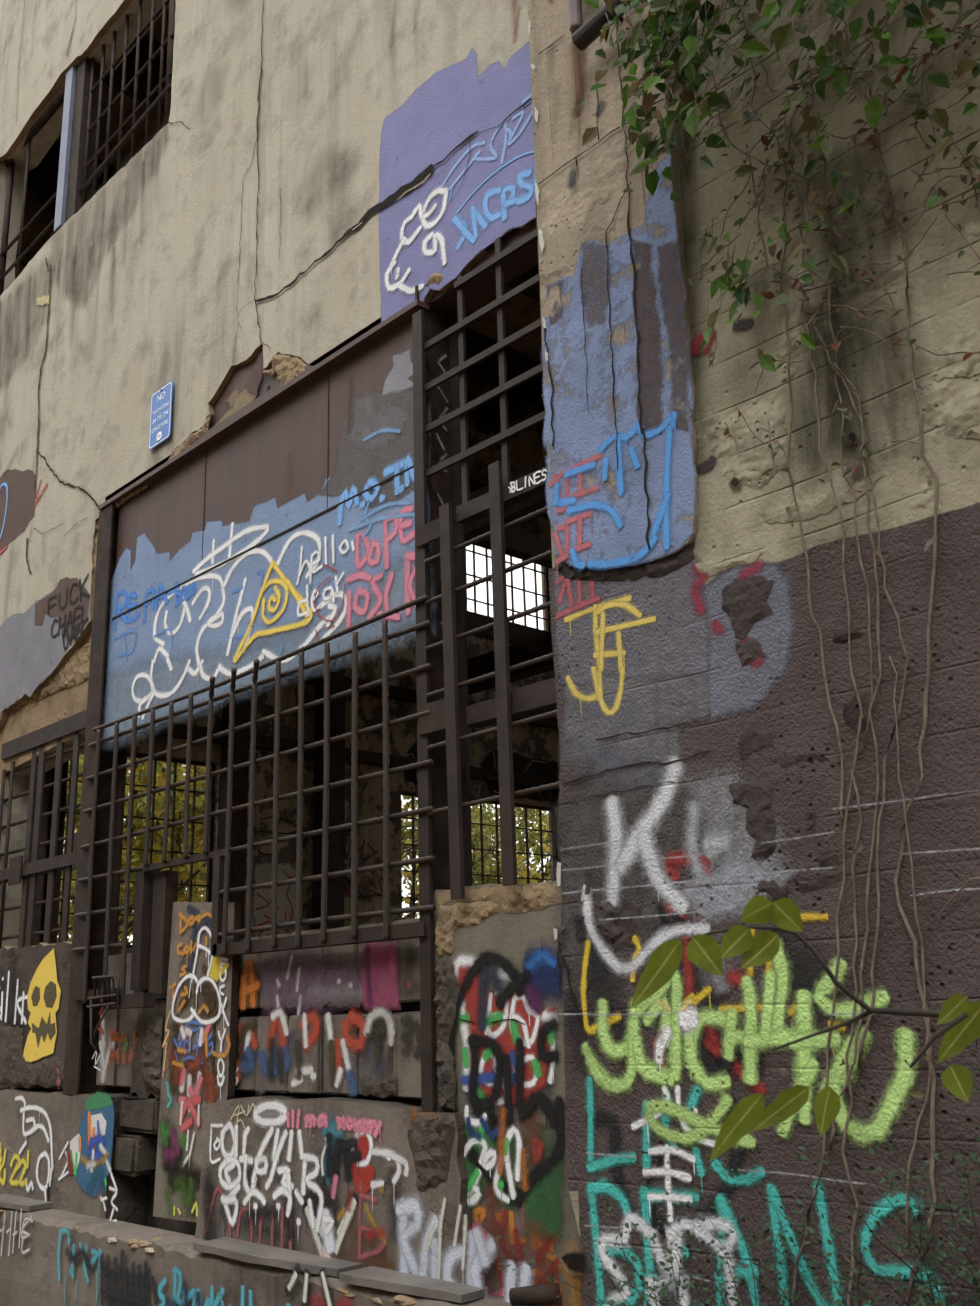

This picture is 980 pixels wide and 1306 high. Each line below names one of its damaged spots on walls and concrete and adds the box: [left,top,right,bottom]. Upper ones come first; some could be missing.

crack [14,257,101,574]
spalling [168,351,307,460]
crack [204,8,532,363]
crack [538,21,666,550]
spalling [555,541,774,667]
spalling [756,474,884,524]
water stain [803,231,870,467]